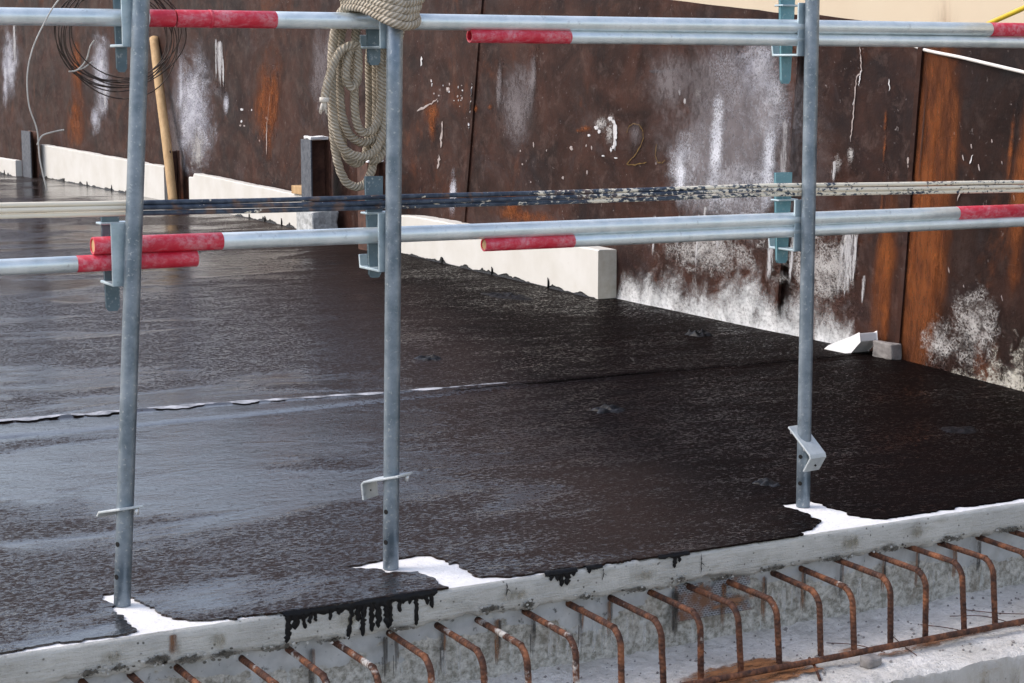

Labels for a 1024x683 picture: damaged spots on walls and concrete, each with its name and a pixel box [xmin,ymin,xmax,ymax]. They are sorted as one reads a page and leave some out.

corrosion [913,47,957,208]
corrosion [1009,139,1024,204]
leakage [824,234,865,301]
corrosion [903,230,948,364]
corrosion [712,577,767,622]
corrosion [684,658,823,683]